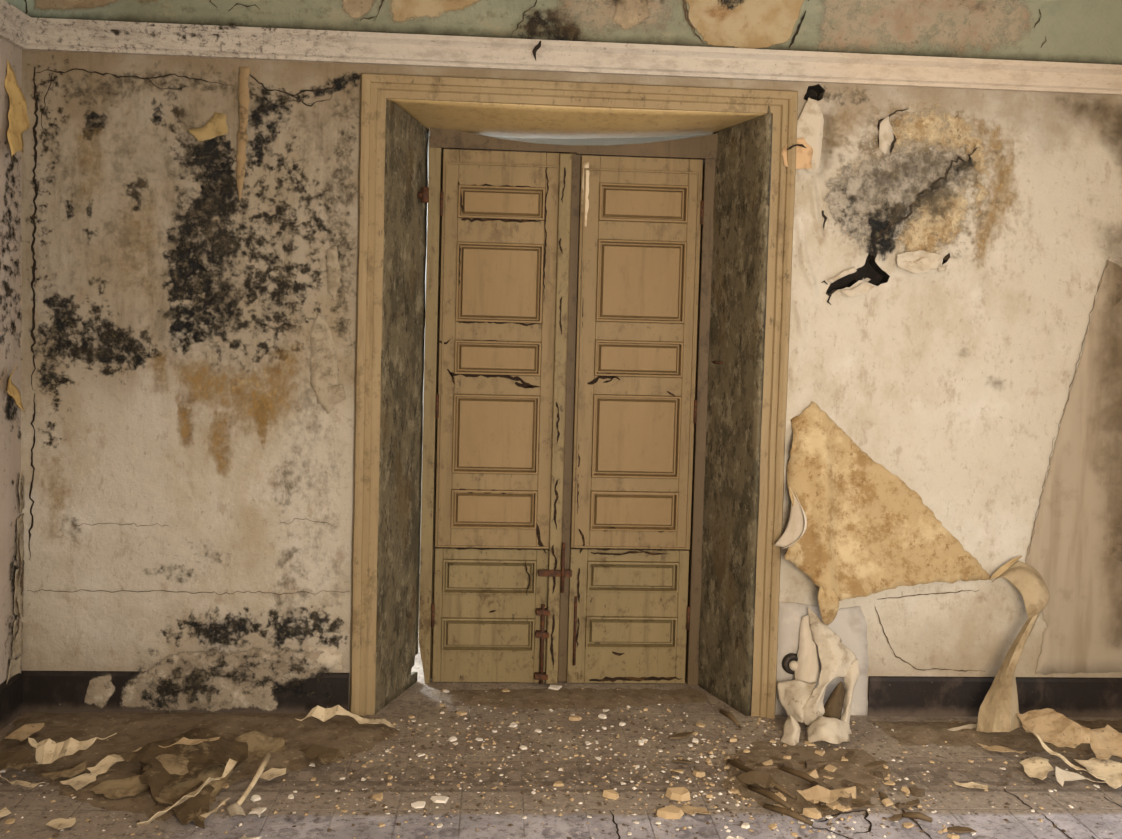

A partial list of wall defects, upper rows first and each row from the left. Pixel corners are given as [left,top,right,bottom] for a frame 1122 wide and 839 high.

spalling [560,0,804,49]
peeling [820,0,1030,53]
peeling [4,60,30,156]
water stain [977,124,1011,258]
water stain [0,73,360,472]
peeling [775,602,869,715]